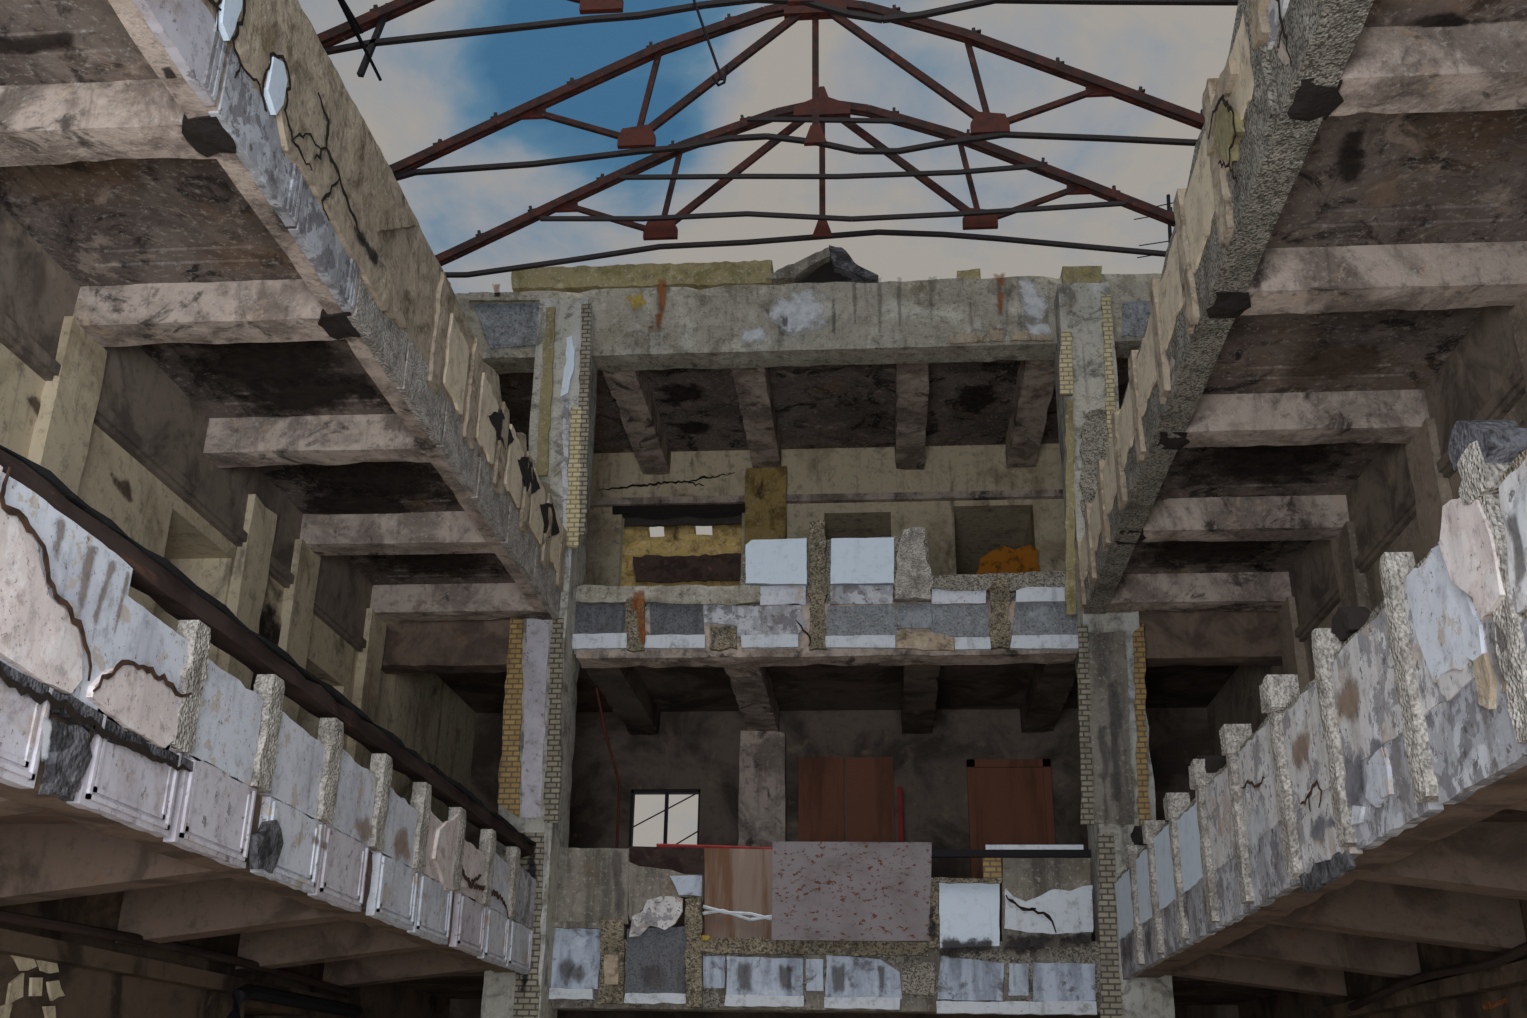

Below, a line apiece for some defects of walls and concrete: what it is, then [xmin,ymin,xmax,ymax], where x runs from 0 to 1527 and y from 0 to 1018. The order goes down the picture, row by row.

damp [0,31,73,53]
flaking render [216,0,243,41]
flaking render [264,57,288,115]
crack [208,0,364,241]
spalling [1287,78,1344,122]
crack [0,467,192,772]
flaking render [0,504,194,801]
spalling [249,820,284,873]
crack [1005,895,1057,933]